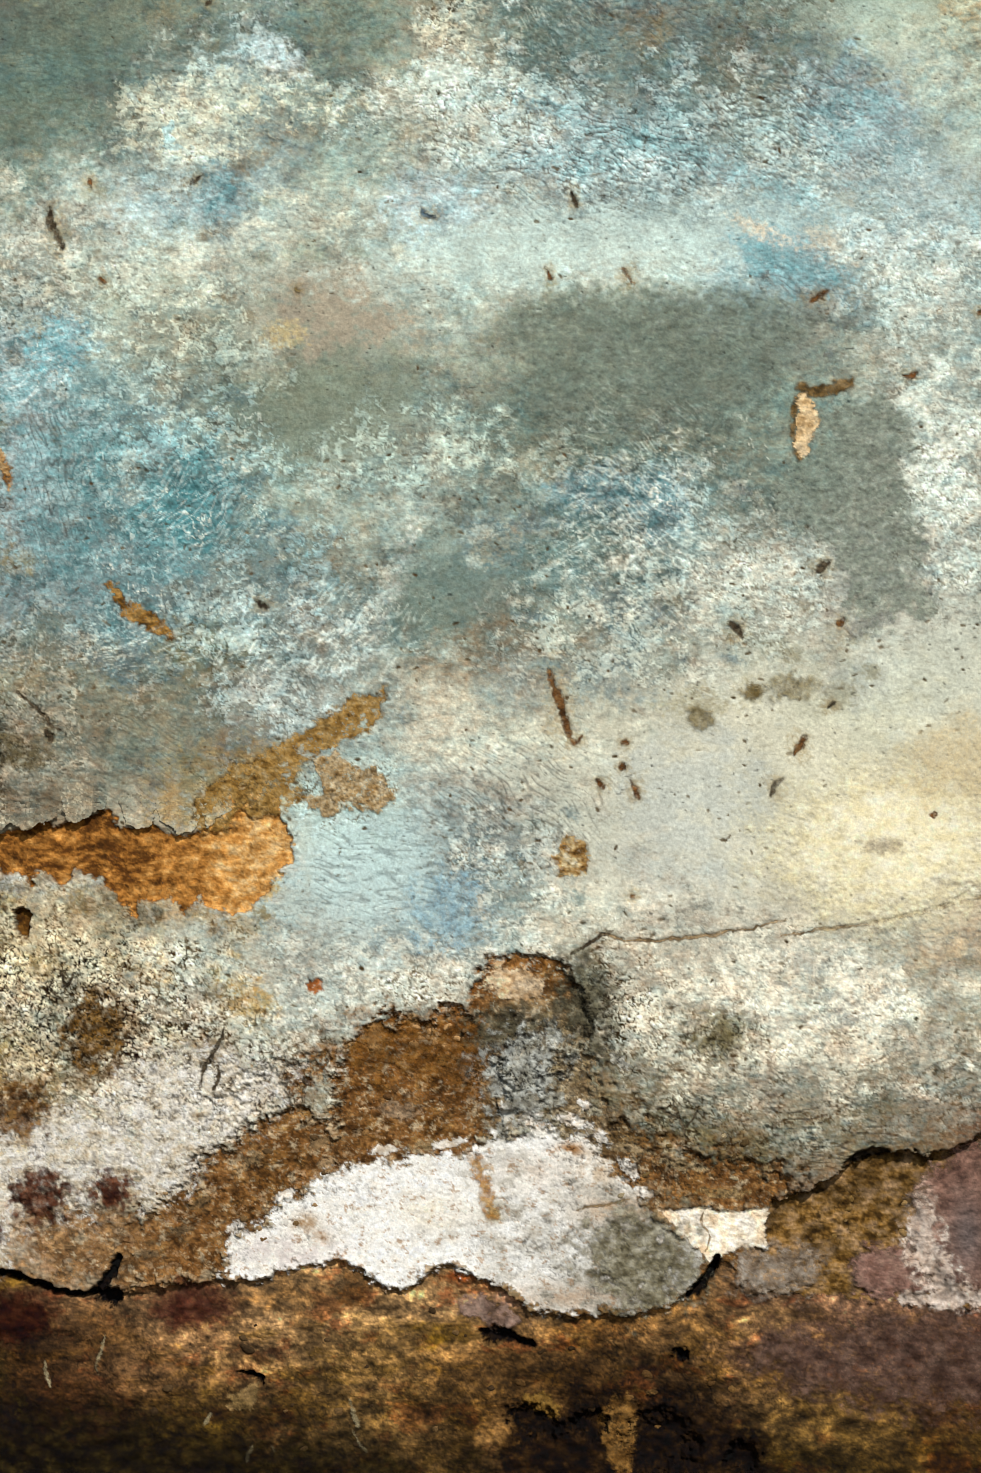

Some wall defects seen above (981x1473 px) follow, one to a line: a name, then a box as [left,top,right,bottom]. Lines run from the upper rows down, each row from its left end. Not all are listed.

peeling [790,378,854,460]
peeling [0,448,13,492]
damp [770,395,938,637]
peeling [104,580,175,641]
damp [0,701,50,793]
peeling [0,685,395,918]
crack [570,884,981,955]
spalling [0,952,981,1473]